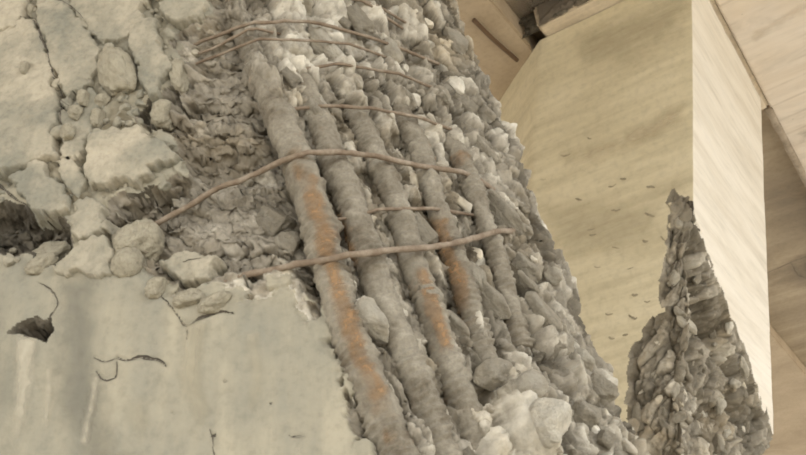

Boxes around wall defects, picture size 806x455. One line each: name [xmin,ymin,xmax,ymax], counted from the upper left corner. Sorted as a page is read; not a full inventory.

spalling [7,315,55,343]
crack [95,355,166,381]
spalling [24,0,651,455]
spalling [624,188,773,455]